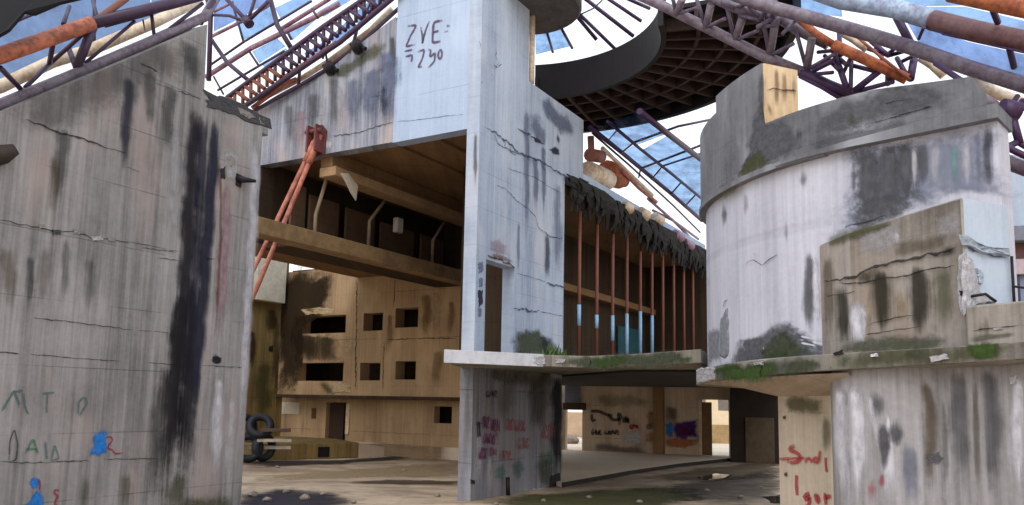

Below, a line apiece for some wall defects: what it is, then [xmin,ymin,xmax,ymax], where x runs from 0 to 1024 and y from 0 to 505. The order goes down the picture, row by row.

crack [26,119,139,172]
crack [485,127,567,239]
leakage [525,101,572,207]
leakage [852,133,992,228]
crack [1,220,179,261]
leakage [161,89,220,464]
leakage [241,156,330,412]
leakage [734,324,823,362]
crack [825,247,955,297]
crack [867,315,915,335]
spalling [957,248,995,317]
leakage [834,390,902,488]